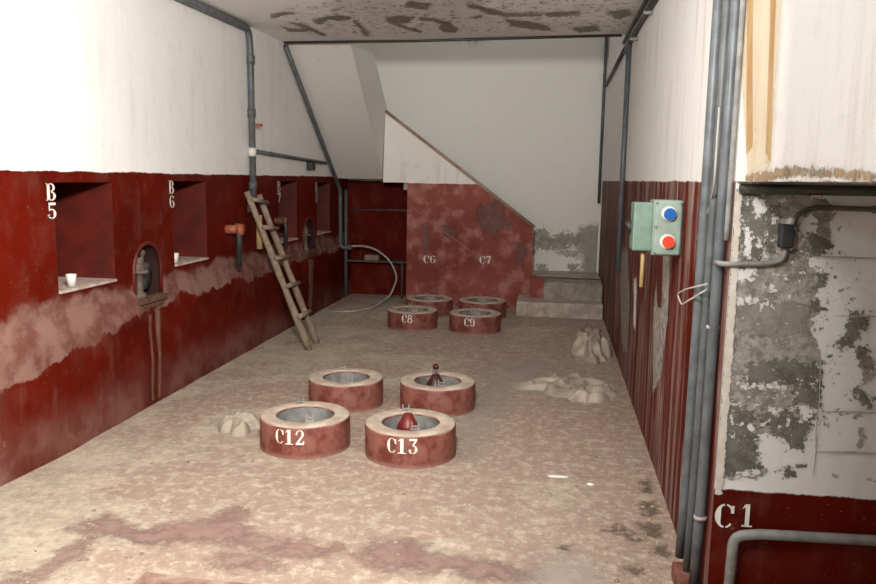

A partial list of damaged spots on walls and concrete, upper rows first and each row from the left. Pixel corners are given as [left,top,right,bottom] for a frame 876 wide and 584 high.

peeling [270,0,640,36]
spalling [715,164,876,495]